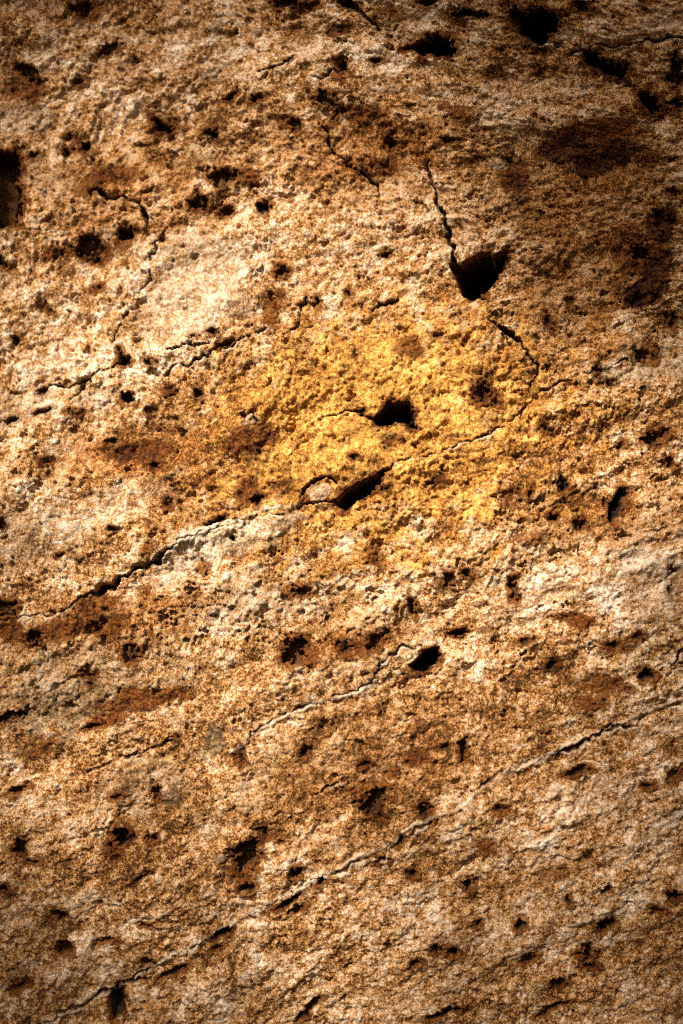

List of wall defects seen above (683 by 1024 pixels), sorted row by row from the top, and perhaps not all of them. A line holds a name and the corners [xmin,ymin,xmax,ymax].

crack [416,163,462,281]
crack [0,476,337,623]
crack [250,644,421,738]
crack [668,703,683,711]
crack [471,719,642,792]
crack [411,824,427,837]
crack [257,853,388,913]
crack [45,938,201,1024]